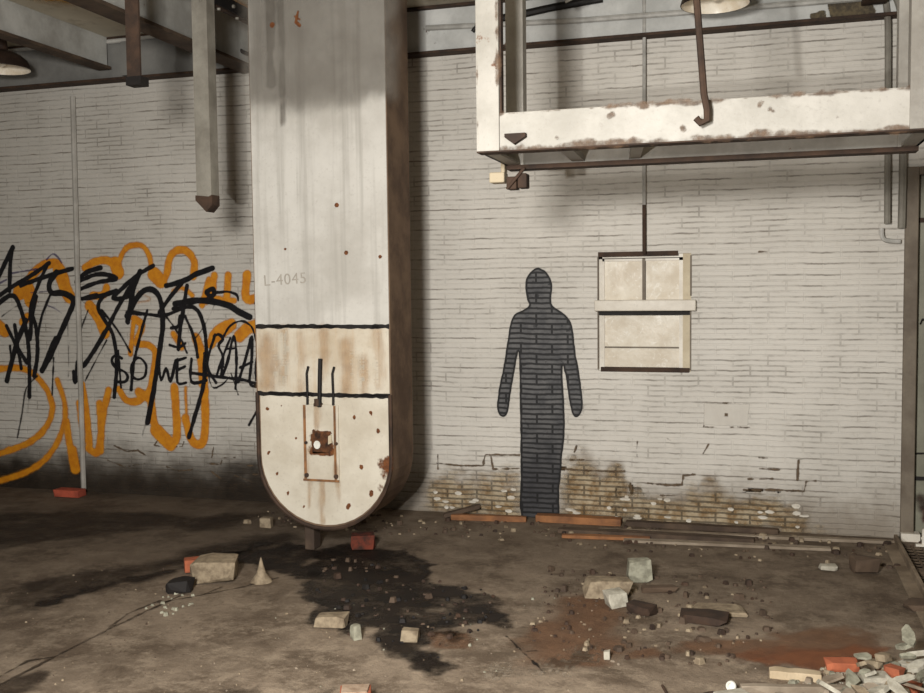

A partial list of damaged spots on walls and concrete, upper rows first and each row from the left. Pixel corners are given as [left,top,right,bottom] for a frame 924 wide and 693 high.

corrosion [606,99,722,116]
water stain [0,465,273,502]
corrosion [369,456,389,497]
peeling [430,473,517,515]
peeling [566,465,809,530]
water stain [0,512,241,544]